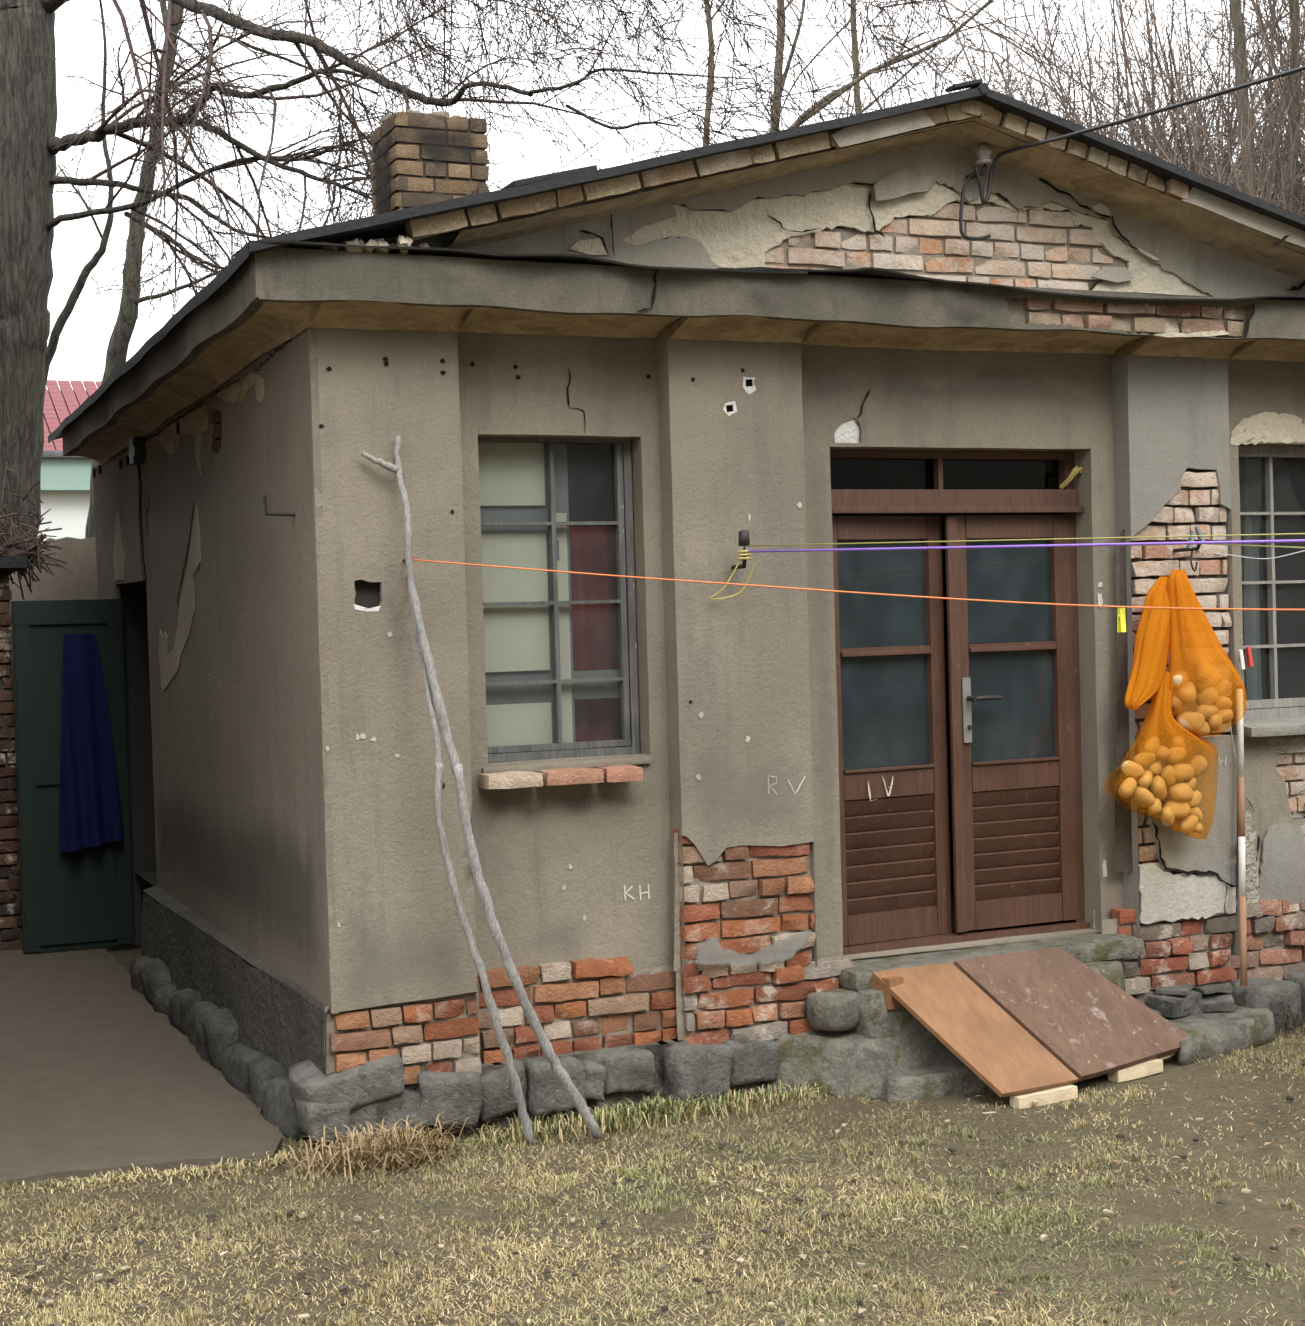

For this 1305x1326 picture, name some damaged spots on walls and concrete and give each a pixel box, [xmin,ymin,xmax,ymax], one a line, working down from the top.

flaking render [570,238,607,256]
flaking render [623,169,1246,338]
crack [1039,178,1138,250]
crack [567,369,585,433]
flaking render [1102,469,1305,1018]
flaking render [324,829,853,1089]